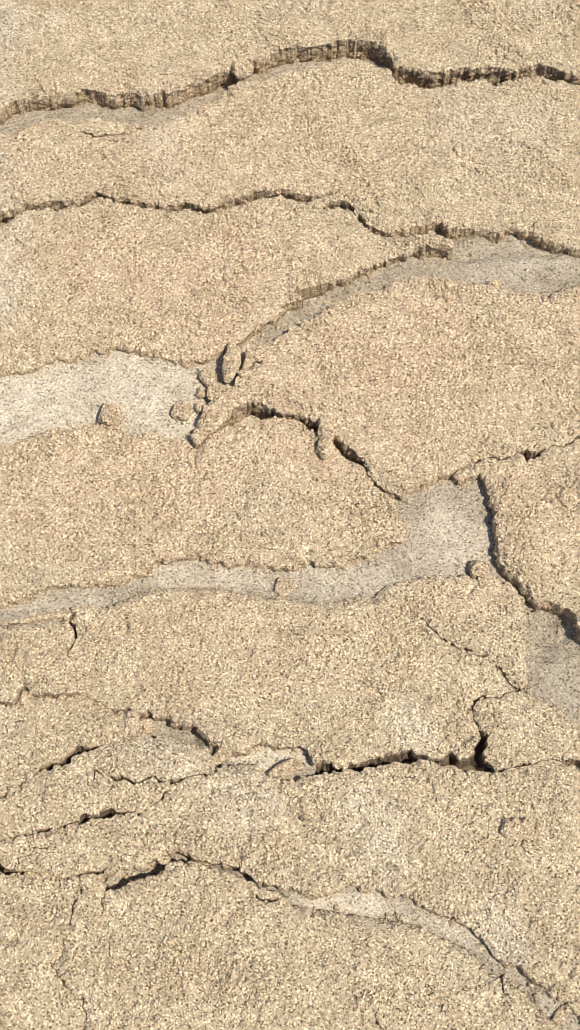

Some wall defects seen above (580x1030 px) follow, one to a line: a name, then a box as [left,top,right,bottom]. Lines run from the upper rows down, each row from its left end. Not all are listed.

crack [0,57,388,138]
crack [0,204,580,449]
crack [0,437,580,1030]